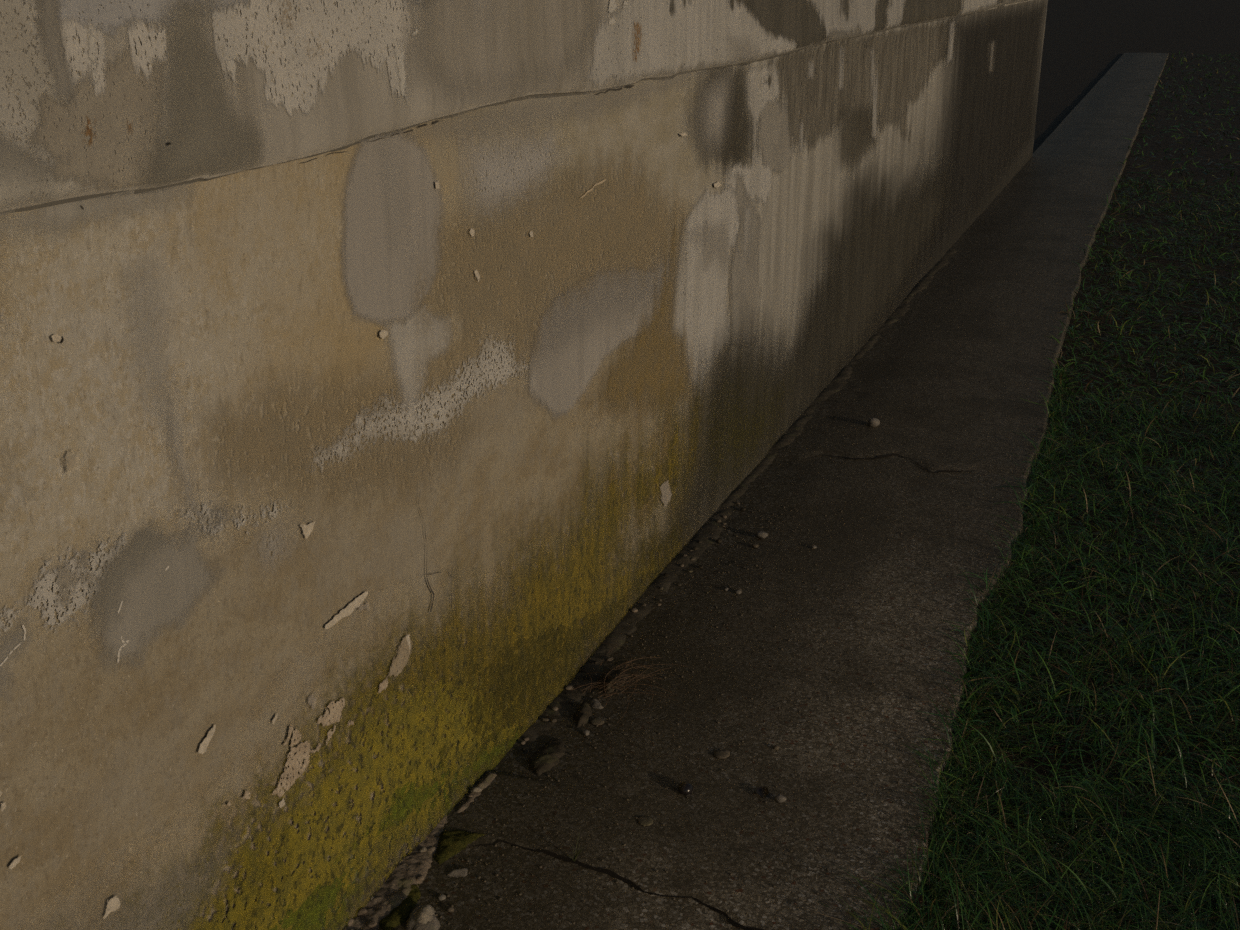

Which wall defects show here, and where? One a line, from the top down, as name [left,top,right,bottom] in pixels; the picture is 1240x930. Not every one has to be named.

water stain [31,0,163,190]
crack [0,6,999,215]
water stain [222,394,350,479]
crack [418,493,452,619]
spalling [378,633,412,693]
spalling [272,695,354,808]
crack [461,840,763,930]